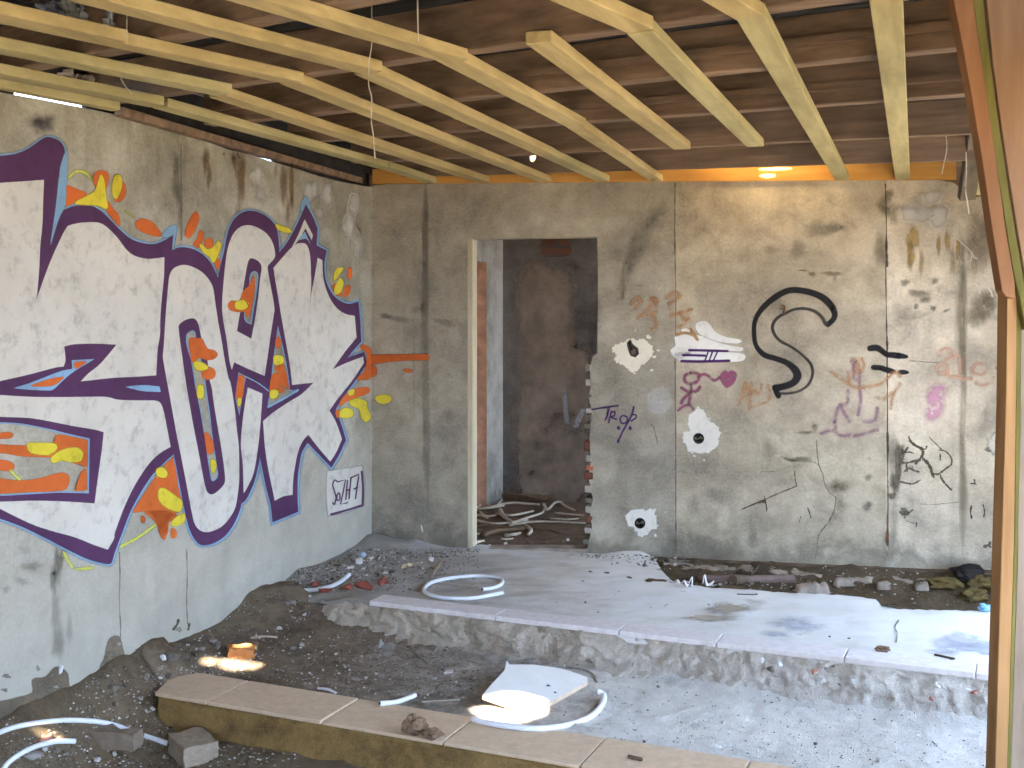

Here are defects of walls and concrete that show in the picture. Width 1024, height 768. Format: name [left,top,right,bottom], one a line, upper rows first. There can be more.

spalling [582,364,593,544]
crack [741,440,837,558]